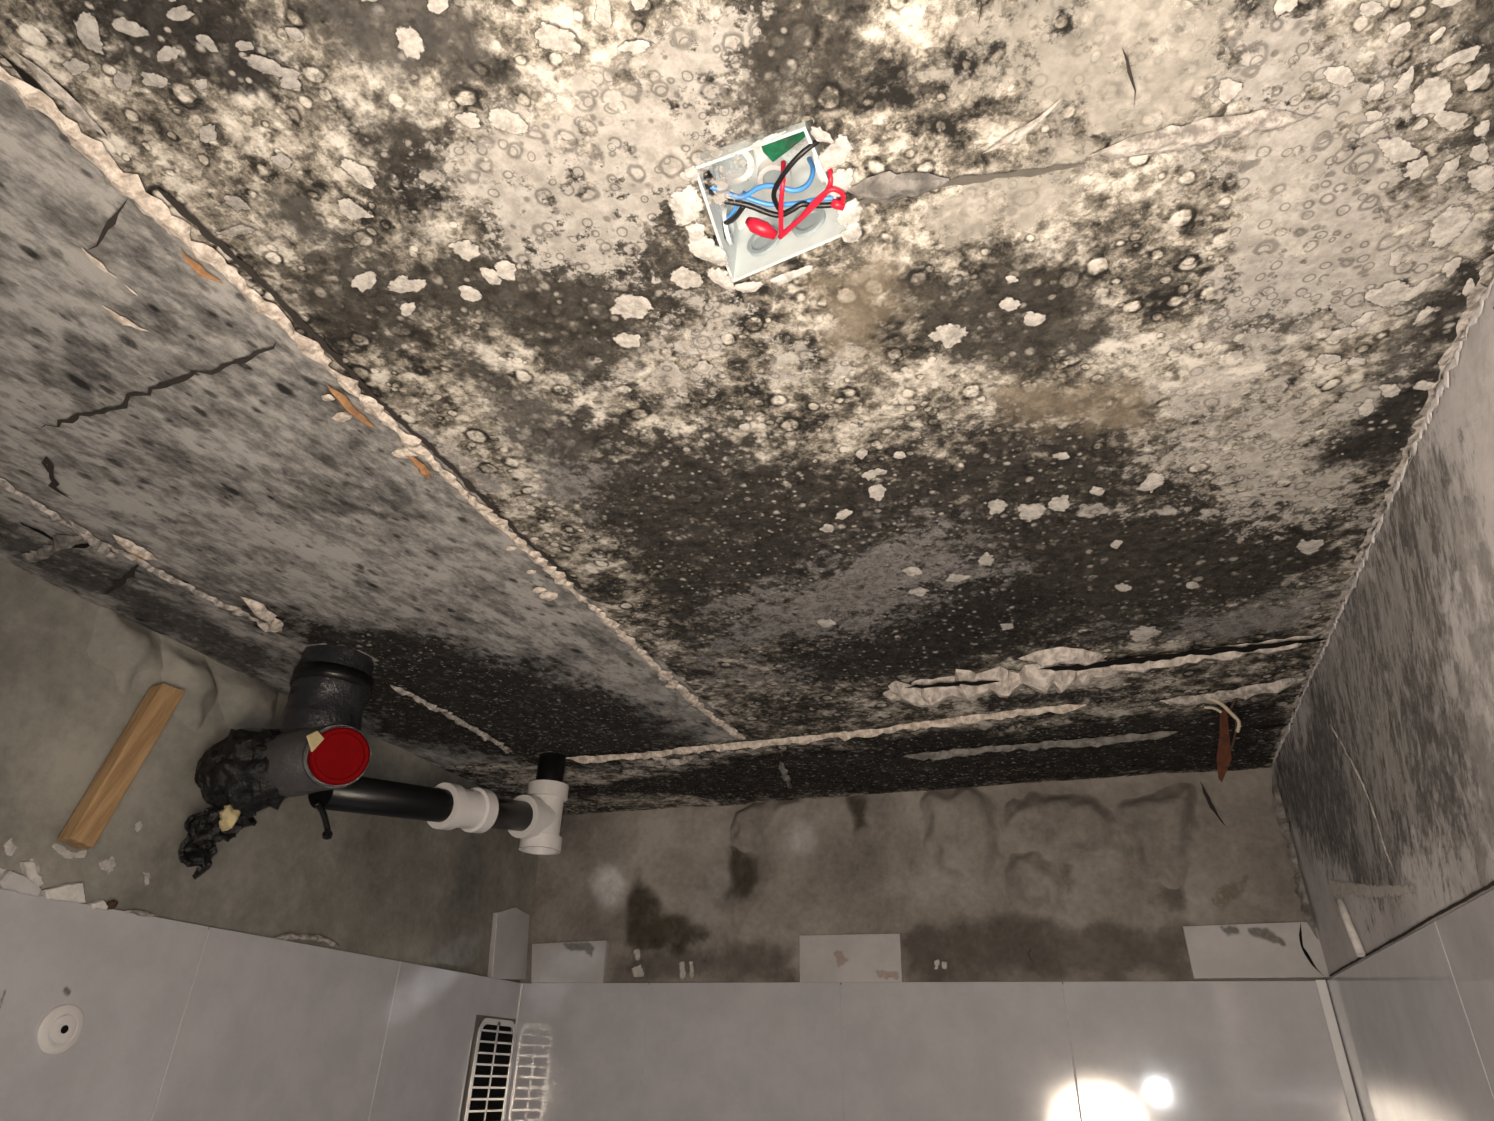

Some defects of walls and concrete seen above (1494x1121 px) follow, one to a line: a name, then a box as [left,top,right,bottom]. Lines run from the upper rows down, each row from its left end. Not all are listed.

water stain [28,0,326,99]
water stain [181,250,223,284]
crack [41,342,276,499]
peeling [819,509,853,533]
water stain [239,0,1494,923]
peeling [855,448,906,501]
peeling [987,494,1071,523]
peeling [1135,470,1165,493]
peeling [1295,539,1326,555]
water stain [0,518,291,677]
spalling [883,625,1329,708]
rust [1204,689,1241,782]